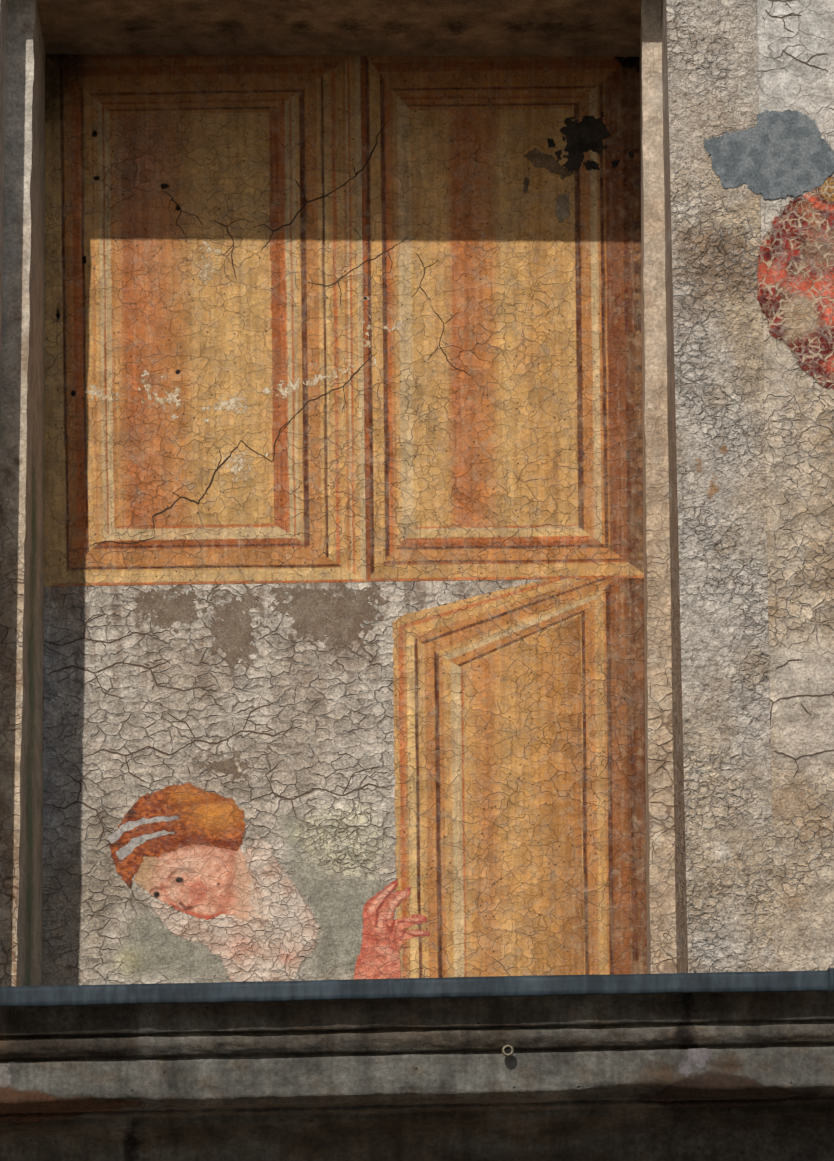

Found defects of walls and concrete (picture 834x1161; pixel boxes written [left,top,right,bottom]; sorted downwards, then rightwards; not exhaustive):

crack [765,0,829,72]
crack [163,118,391,282]
peeling [523,111,634,223]
crack [308,238,471,376]
crack [92,354,375,545]
crack [45,615,389,846]
leakage [0,1004,162,1124]
leakage [675,993,712,1076]